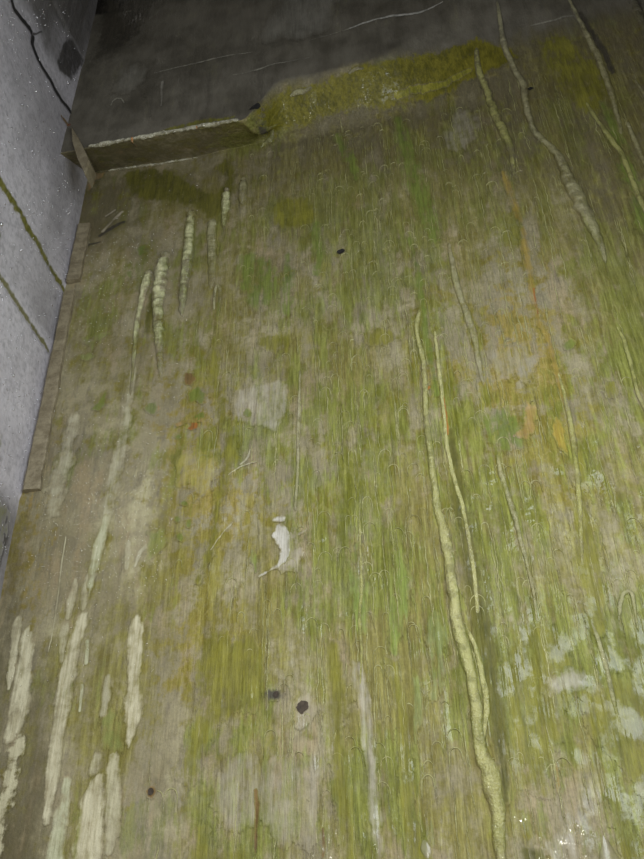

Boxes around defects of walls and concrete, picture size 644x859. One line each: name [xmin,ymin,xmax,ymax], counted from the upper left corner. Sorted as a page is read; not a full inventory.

crack [10,0,71,114]
crack [154,1,443,75]
water stain [143,292,153,334]
water stain [42,366,147,859]
water stain [0,615,36,857]